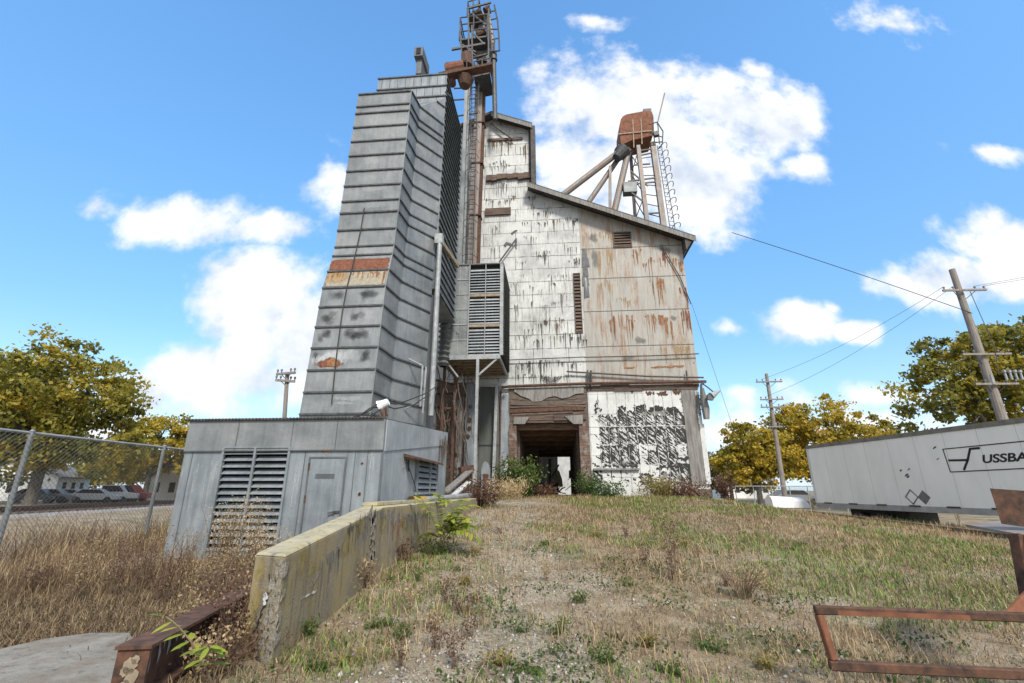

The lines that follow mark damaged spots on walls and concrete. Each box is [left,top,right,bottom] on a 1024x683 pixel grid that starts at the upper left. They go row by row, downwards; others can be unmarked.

rust [324,257,390,286]
water stain [486,141,597,385]
rust [591,231,694,368]
rust [312,350,352,368]
peeling [592,389,699,488]
peeling [119,630,187,683]
spalling [254,556,289,664]
water stain [313,508,431,621]